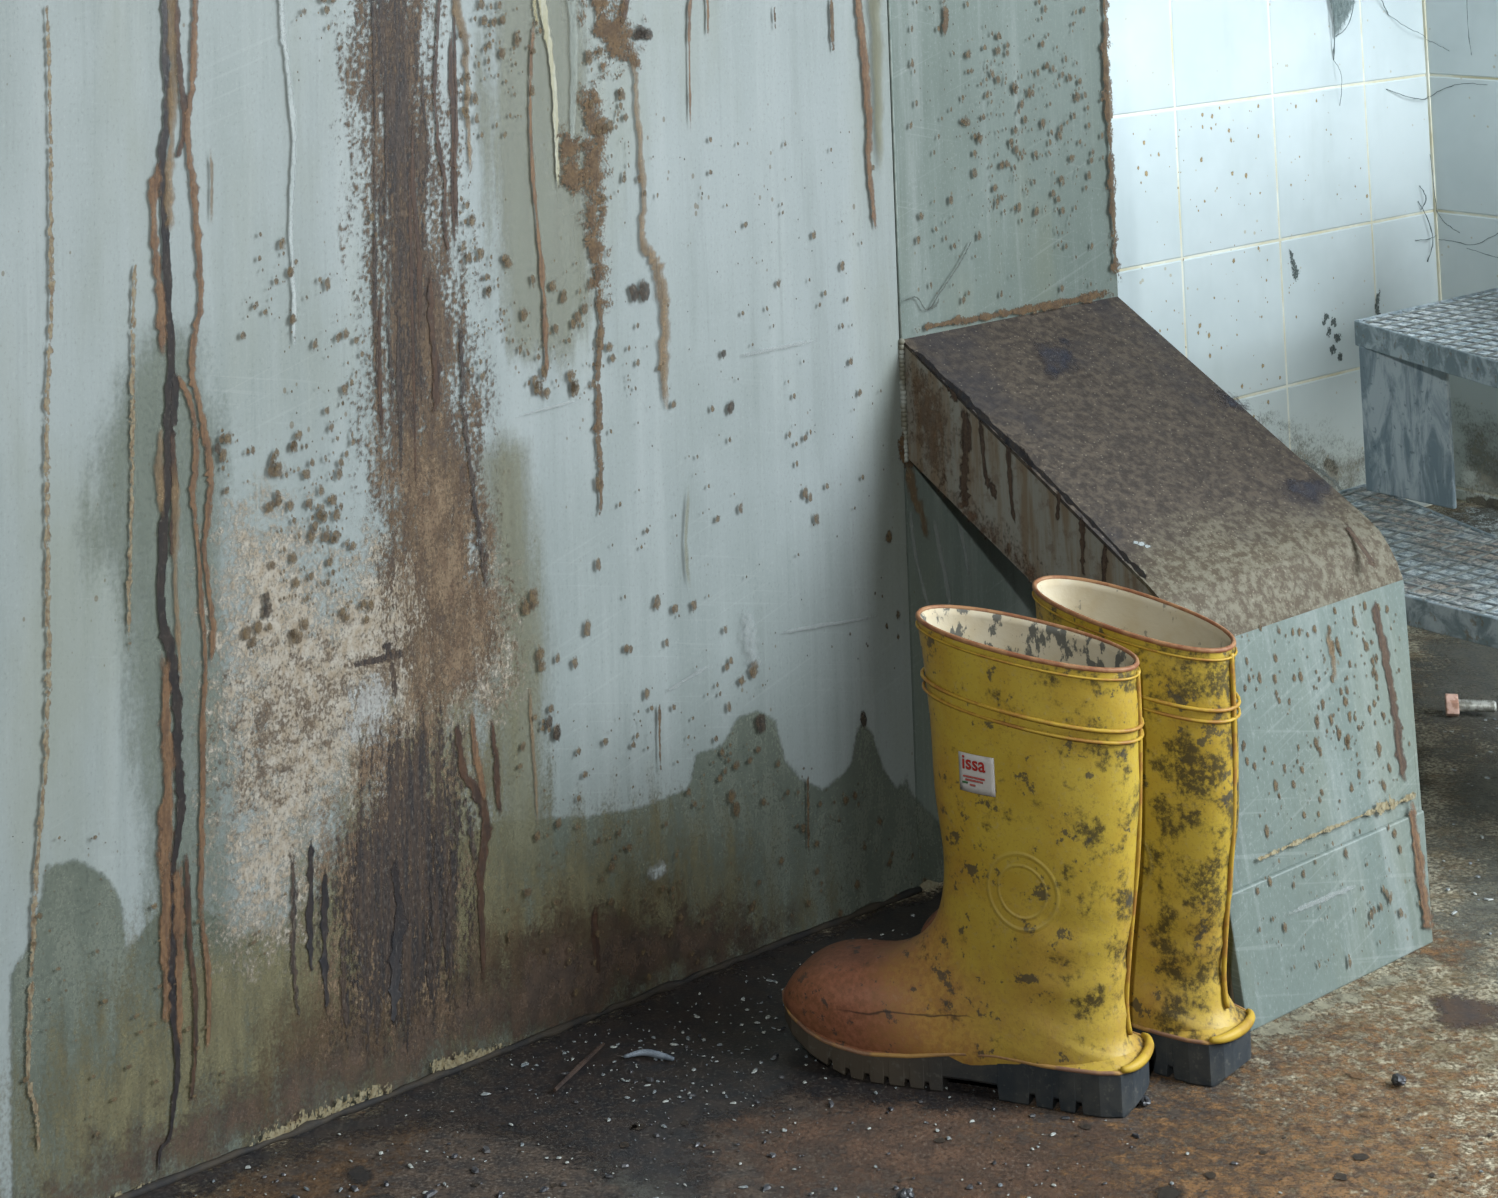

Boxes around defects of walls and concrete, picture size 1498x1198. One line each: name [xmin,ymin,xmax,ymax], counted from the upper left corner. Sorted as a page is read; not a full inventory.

corrosion [791,0,882,227]
corrosion [100,0,720,1101]
corrosion [790,483,829,526]
corrosion [883,349,1147,582]
damp [11,344,944,1198]
corrosion [603,687,926,936]